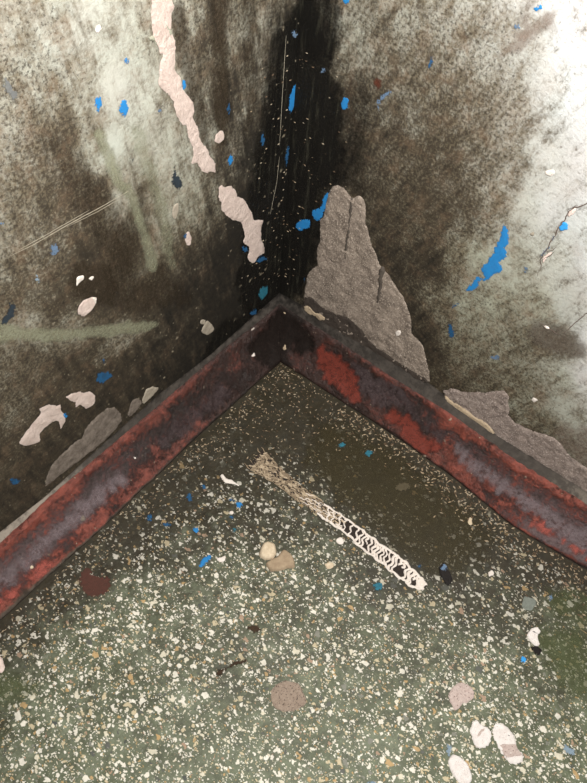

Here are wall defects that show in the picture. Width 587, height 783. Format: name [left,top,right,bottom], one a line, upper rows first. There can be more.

spalling [149,0,216,173]
damp [174,13,206,138]
spalling [218,185,267,263]
damp [205,0,355,368]
spalling [303,185,430,382]
crack [536,203,587,278]
peeling [19,391,95,446]
peeling [45,386,158,486]
peeling [443,388,587,491]
peeling [456,445,587,561]
rust [79,568,111,598]